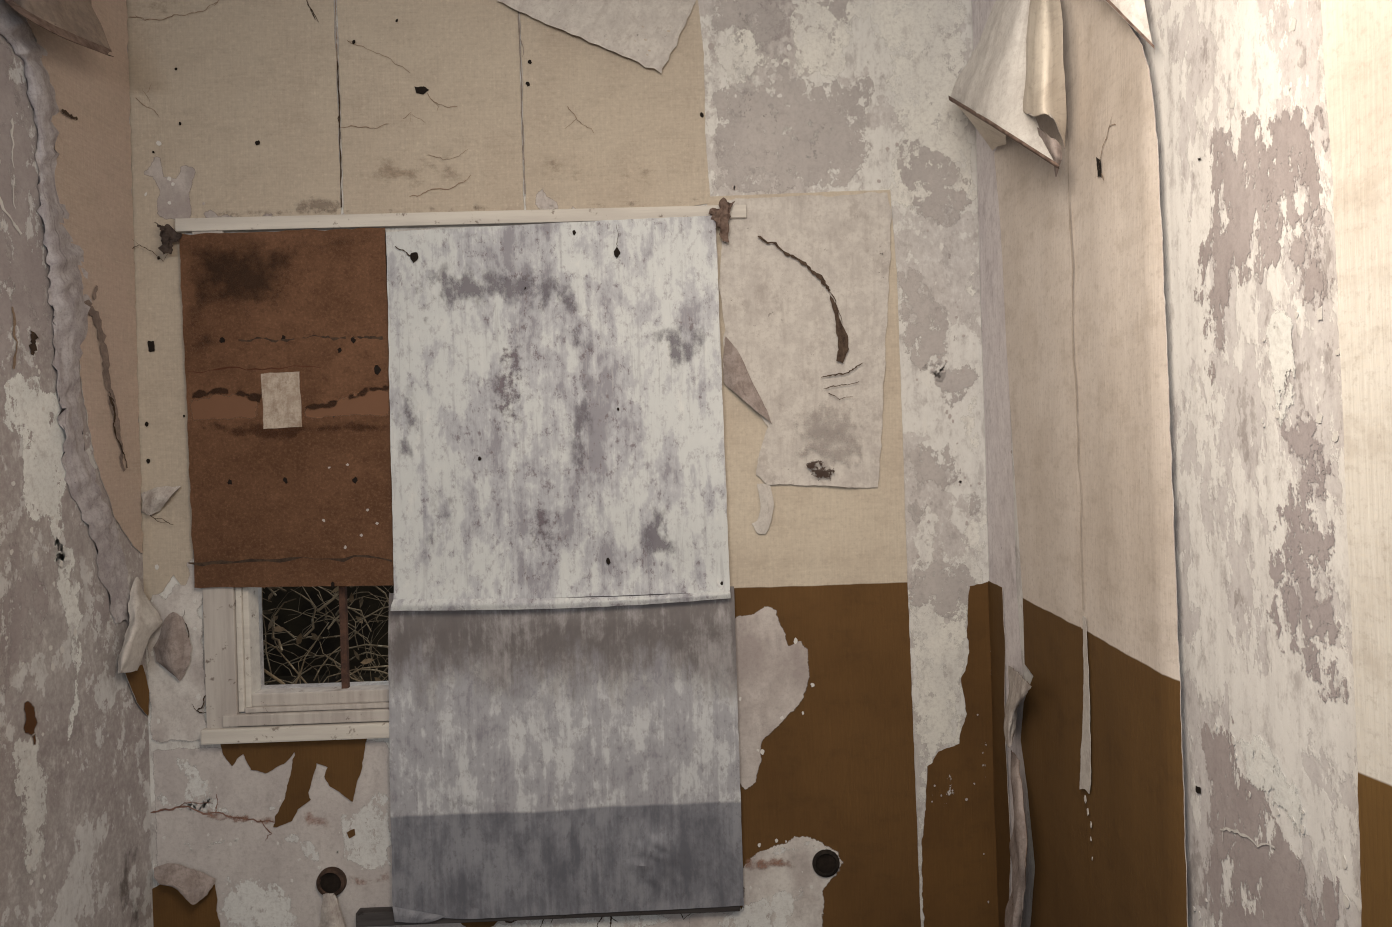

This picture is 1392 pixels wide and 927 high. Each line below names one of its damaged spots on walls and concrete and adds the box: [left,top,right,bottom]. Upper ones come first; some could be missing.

peeling [708,0,1031,927]
peeling [1193,85,1351,704]
flaking render [147,557,465,927]
spalling [492,836,843,927]
peeling [1193,716,1350,927]